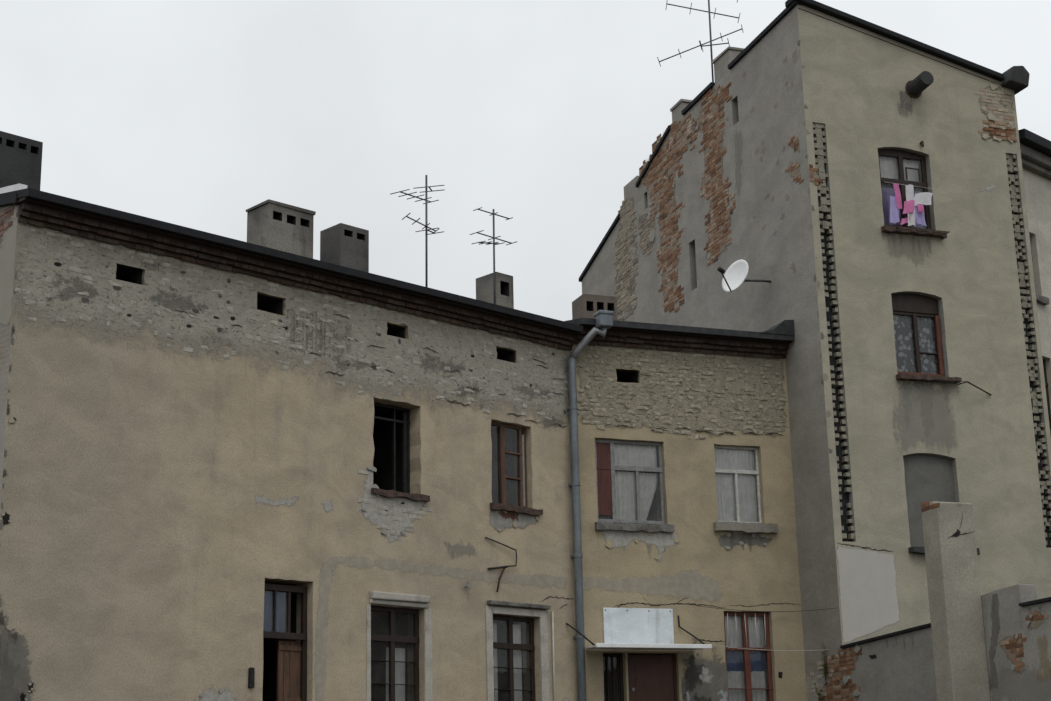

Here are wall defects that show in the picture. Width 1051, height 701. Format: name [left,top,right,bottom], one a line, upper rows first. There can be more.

flaking render [974,83,1017,143]
flaking render [613,82,736,321]
spalling [0,205,788,440]
spalling [357,466,432,542]
spalling [489,510,540,532]
flaking render [602,530,680,561]
crack [613,597,794,608]
leakage [0,598,32,701]
leakage [681,639,728,701]
flaking render [805,645,877,701]
flaking render [999,611,1049,675]